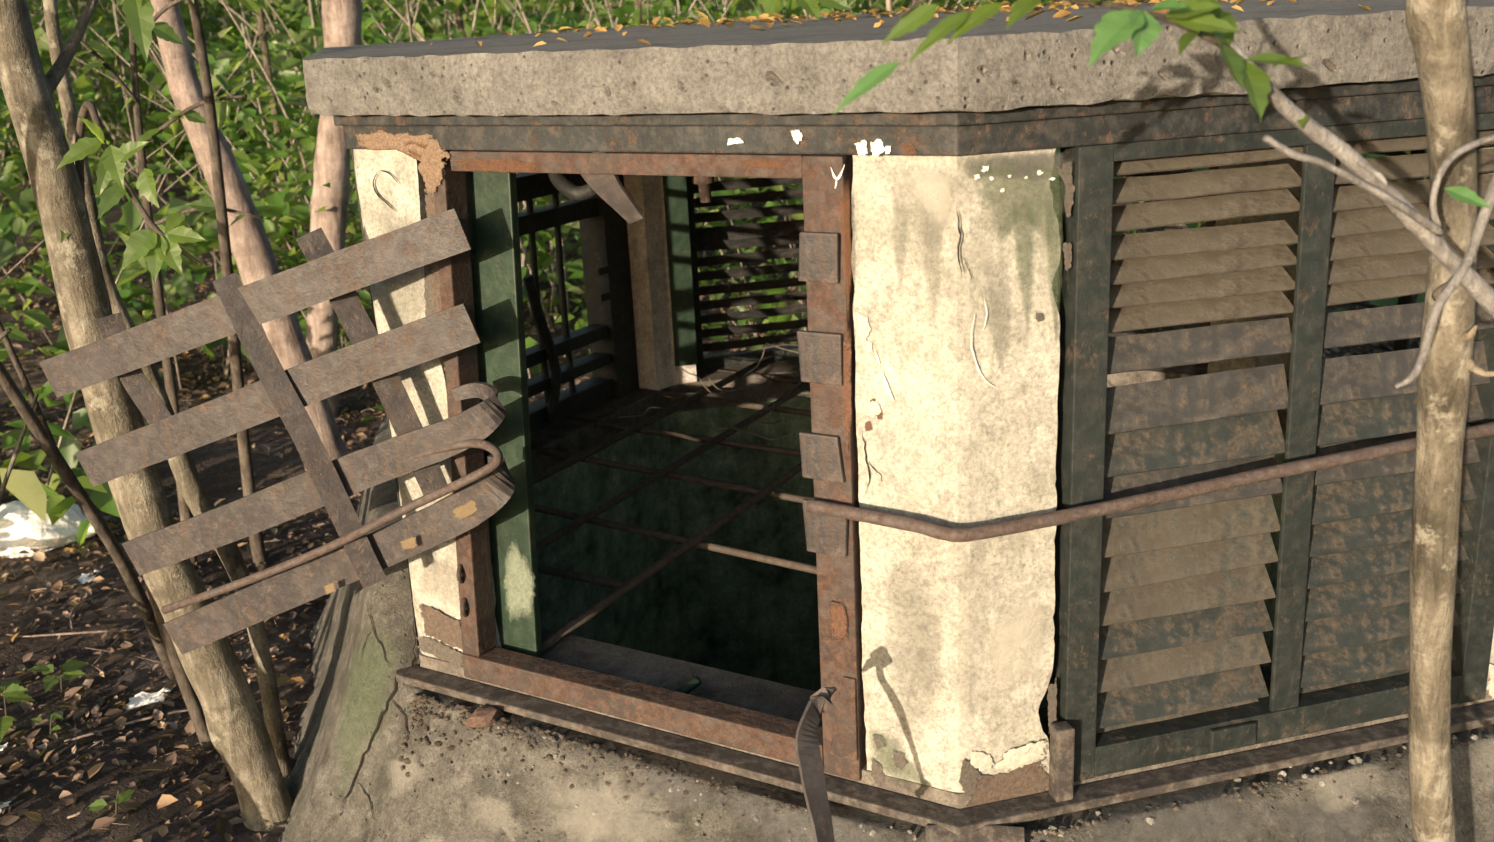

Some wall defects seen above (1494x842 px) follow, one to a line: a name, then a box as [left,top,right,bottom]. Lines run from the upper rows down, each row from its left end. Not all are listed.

spalling [355,130,452,218]
rust [459,159,537,173]
spalling [974,162,1075,218]
damp [981,155,1059,288]
spalling [1062,243,1072,271]
spalling [424,261,441,316]
rust [828,604,847,640]
spalling [1486,664,1494,699]
crack [340,602,416,822]
spalling [959,678,1057,808]